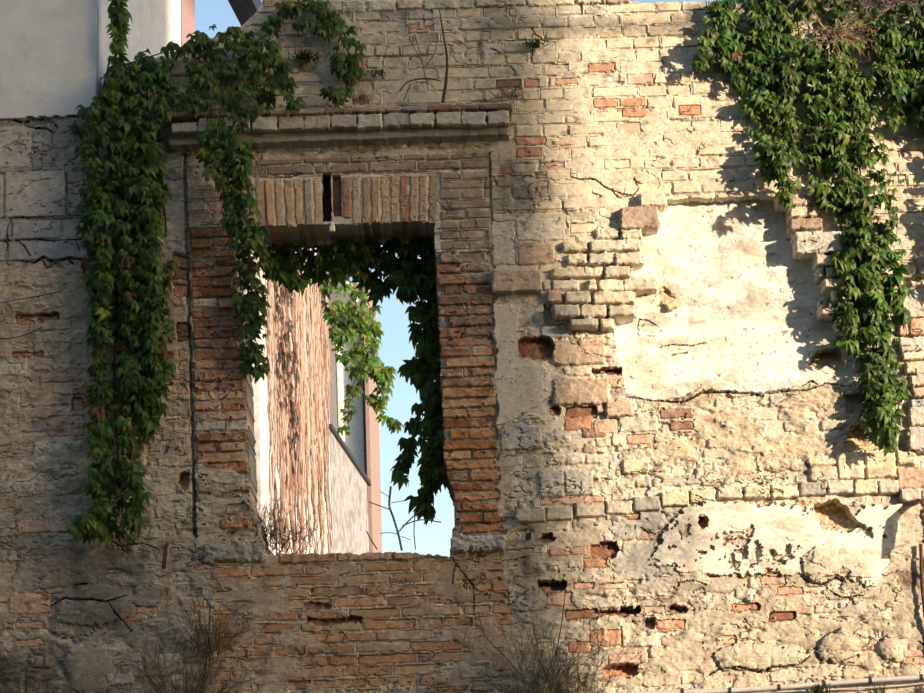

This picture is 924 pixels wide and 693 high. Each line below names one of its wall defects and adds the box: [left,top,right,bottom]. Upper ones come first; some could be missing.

flaking render [591,195,891,453]
flaking render [650,498,903,586]
crack [45,583,132,632]
spalling [303,601,363,627]